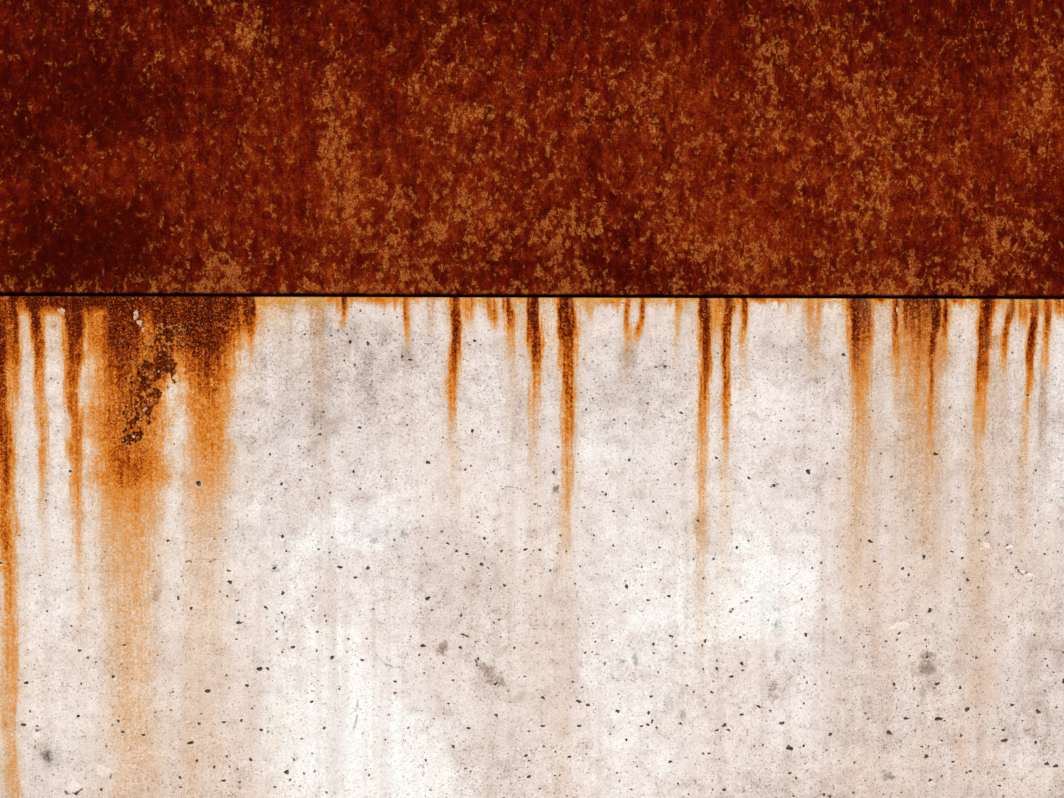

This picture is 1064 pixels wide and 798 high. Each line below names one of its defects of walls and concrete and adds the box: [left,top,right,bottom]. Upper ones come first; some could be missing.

corrosion [0,296,1064,797]